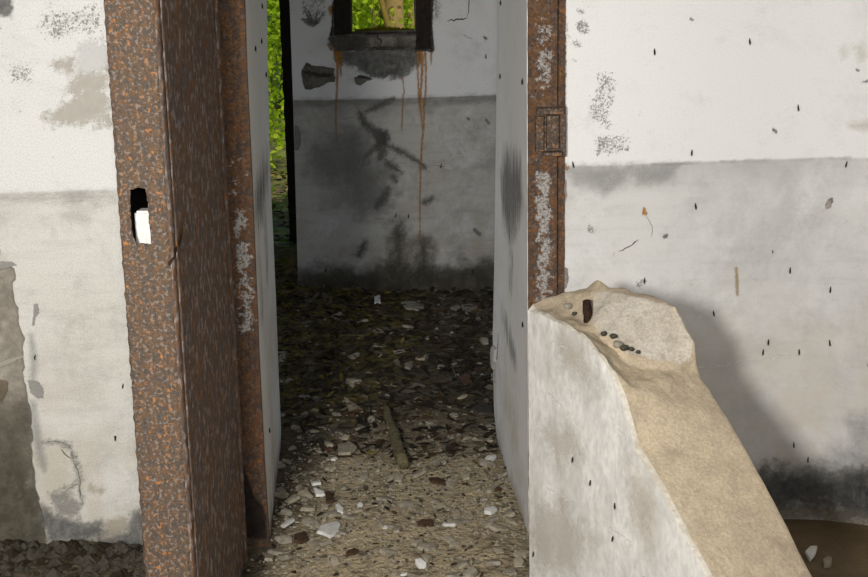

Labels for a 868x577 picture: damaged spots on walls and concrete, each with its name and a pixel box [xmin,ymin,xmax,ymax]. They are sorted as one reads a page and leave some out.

leakage [0,0,13,16]
peeling [52,43,112,126]
spalling [301,49,421,90]
leakage [359,98,425,209]
corrosion [416,50,432,239]
leakage [503,155,521,234]
crack [42,441,83,503]
leakage [757,466,868,525]